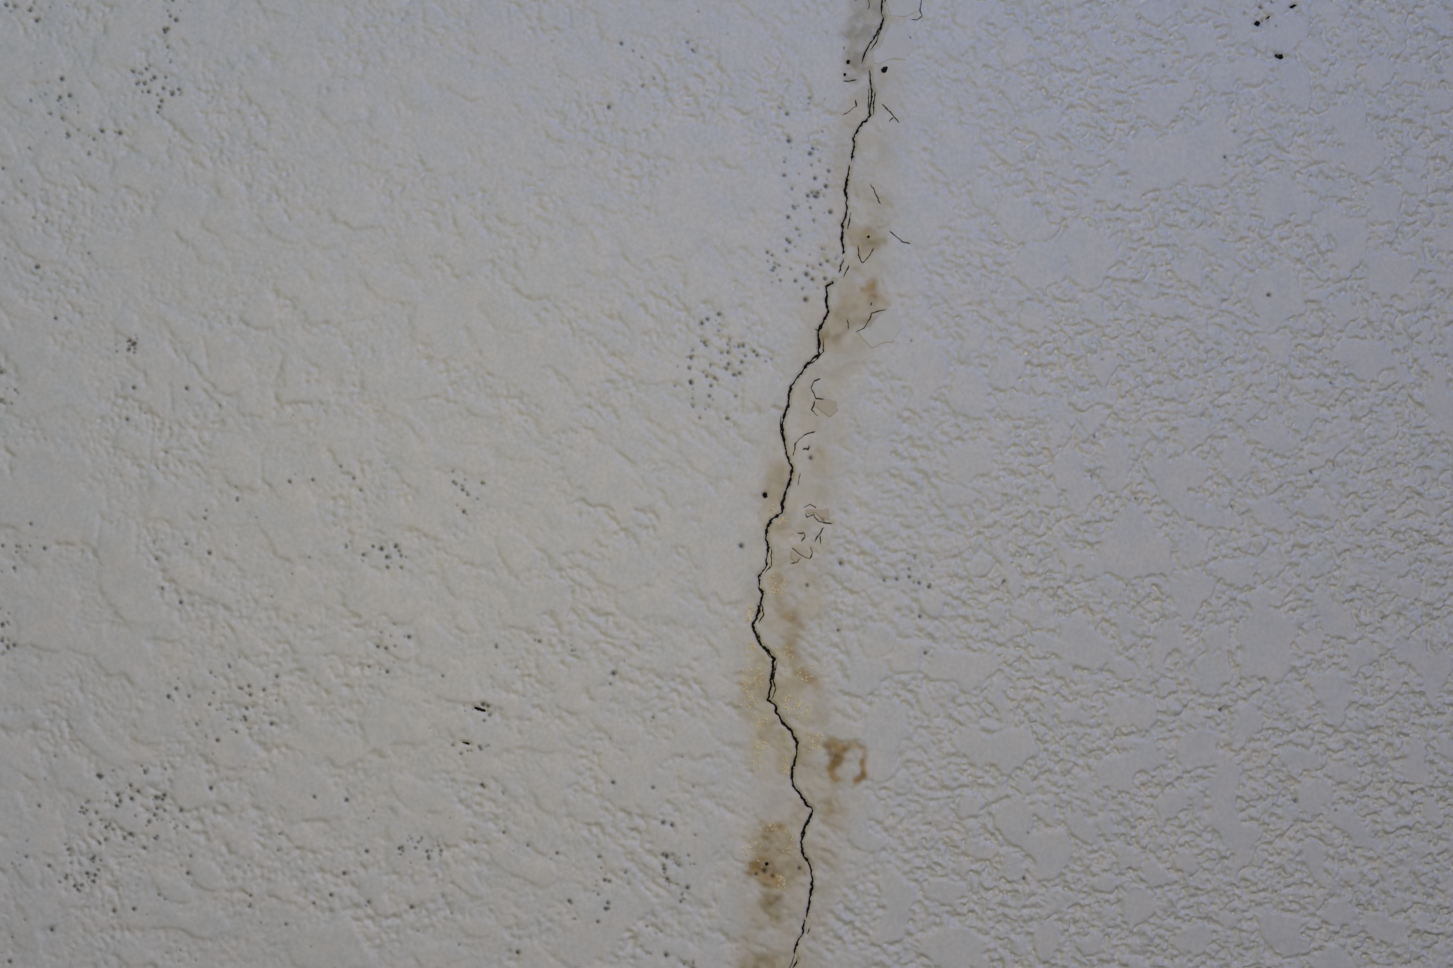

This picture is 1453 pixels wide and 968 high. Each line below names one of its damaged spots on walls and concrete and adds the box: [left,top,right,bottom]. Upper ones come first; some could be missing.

water stain [718,0,927,968]
crack [752,0,923,968]